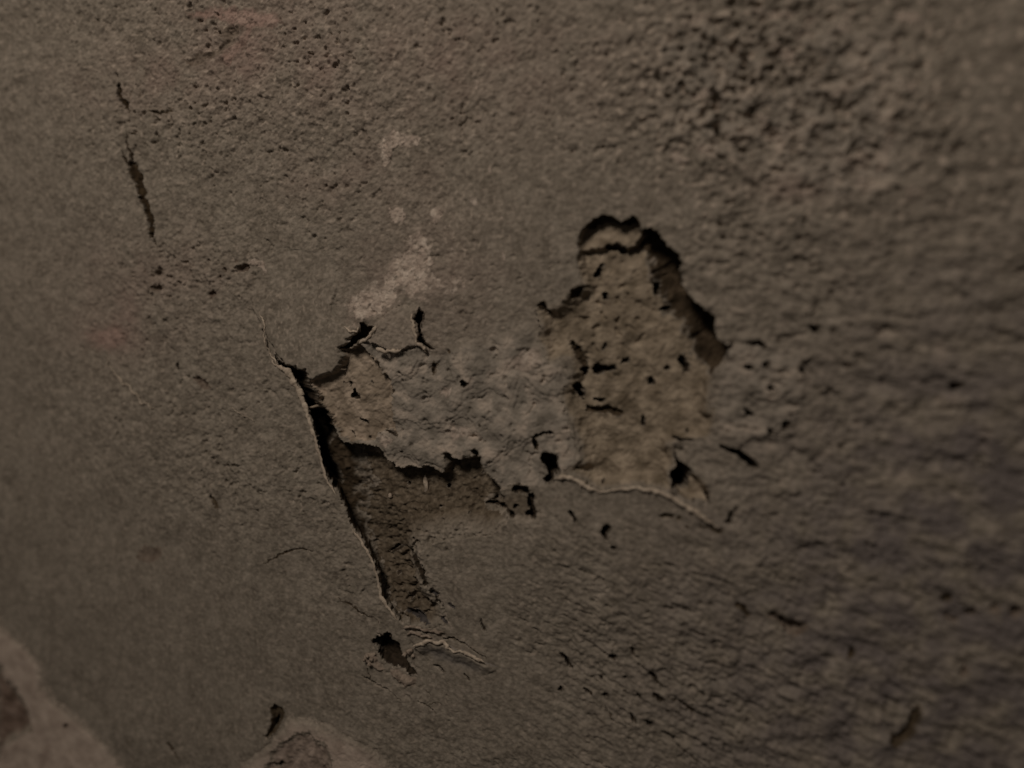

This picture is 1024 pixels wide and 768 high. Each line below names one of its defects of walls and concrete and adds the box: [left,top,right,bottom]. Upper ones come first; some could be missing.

crack [116,72,157,248]
flaking render [252,247,451,441]
spalling [532,214,811,502]
spalling [390,536,455,626]
spalling [484,480,542,524]
spalling [600,524,618,551]
spalling [676,506,738,535]
flaking render [402,639,498,680]